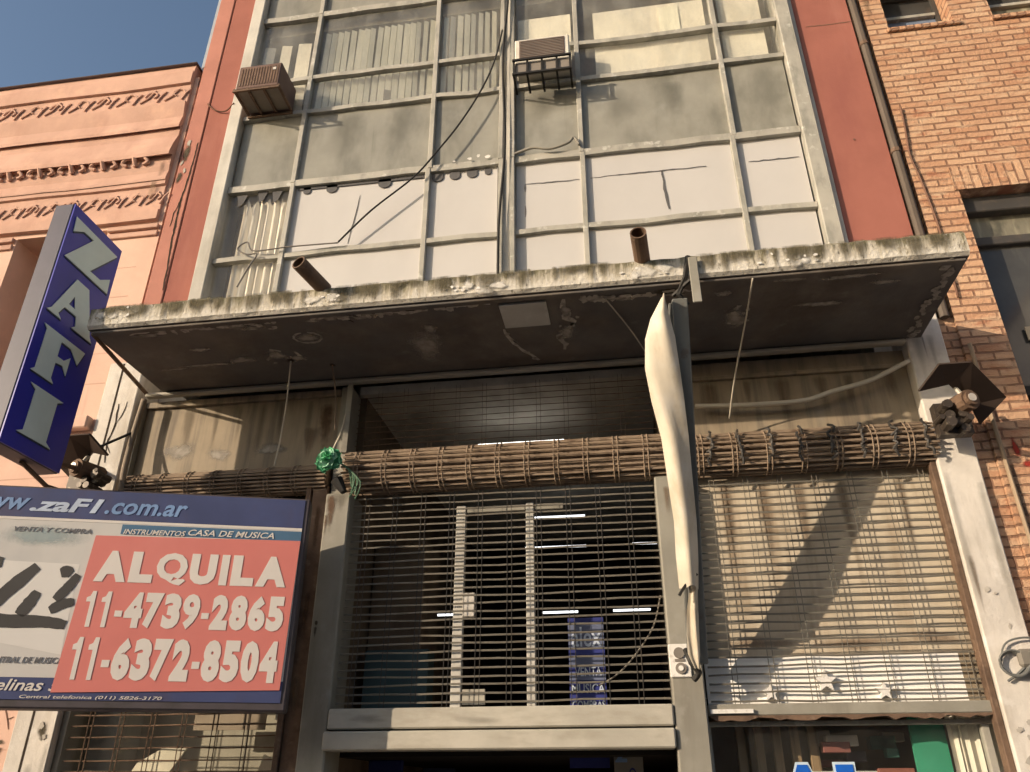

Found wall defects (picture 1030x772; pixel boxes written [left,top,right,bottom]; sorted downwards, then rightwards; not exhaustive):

crack [162,143,198,290]
damp [433,269,530,290]
damp [552,263,608,278]
damp [246,294,258,307]
damp [271,290,305,305]
damp [337,279,420,303]